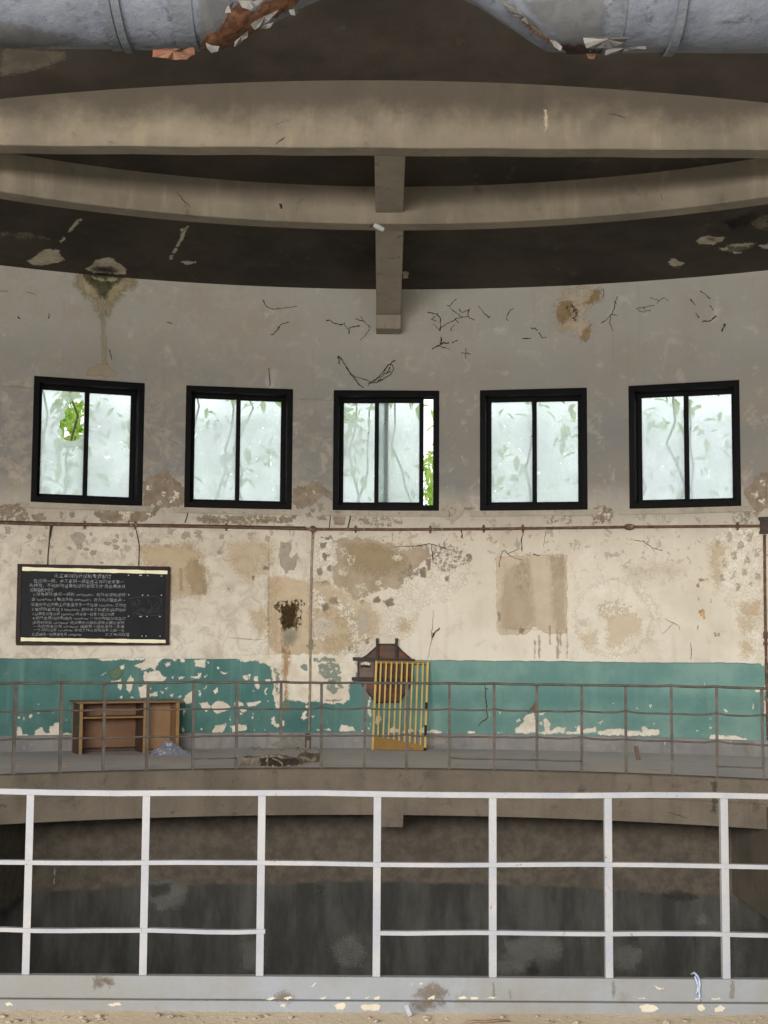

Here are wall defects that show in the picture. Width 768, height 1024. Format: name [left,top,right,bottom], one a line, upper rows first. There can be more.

peeling [1,219,82,266]
peeling [169,225,196,265]
peeling [696,235,768,254]
leakage [77,274,136,377]
leakage [554,288,601,342]
peeling [0,503,46,534]
peeling [99,480,474,733]
leakage [227,542,378,656]
leakage [496,554,661,658]
peeling [16,704,72,736]
peeling [515,702,660,736]